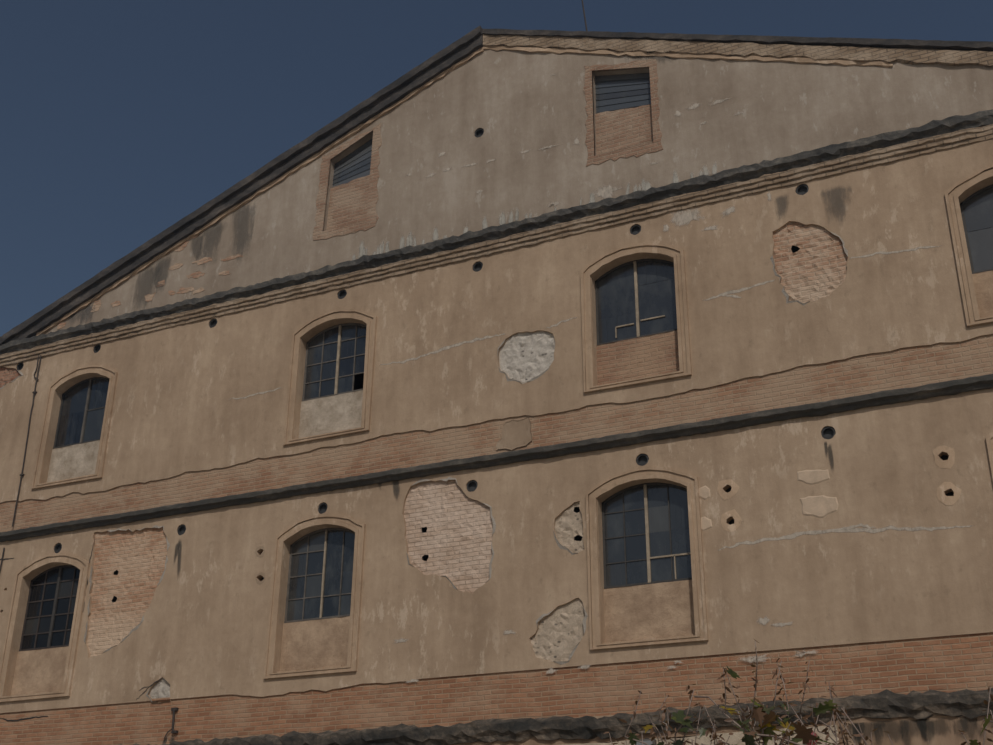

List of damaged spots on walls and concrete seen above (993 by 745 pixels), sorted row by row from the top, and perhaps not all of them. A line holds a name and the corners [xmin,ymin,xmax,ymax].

flaking render [770,222,848,306]
flaking render [497,331,555,384]
flaking render [404,477,496,594]
flaking render [553,502,584,555]
flaking render [84,525,170,657]
flaking render [530,598,588,673]